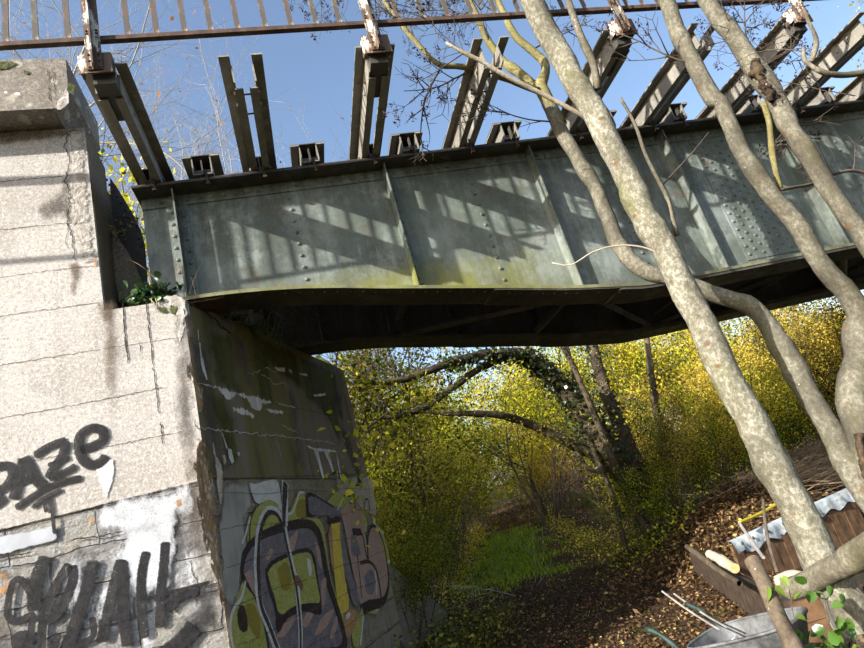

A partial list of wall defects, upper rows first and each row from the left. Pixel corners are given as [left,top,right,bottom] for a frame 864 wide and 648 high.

leakage [0,129,79,143]
leakage [40,186,67,216]
crack [63,130,76,260]
crack [122,302,163,443]
spalling [186,360,204,412]
leakage [177,330,359,479]
spalling [193,439,226,611]